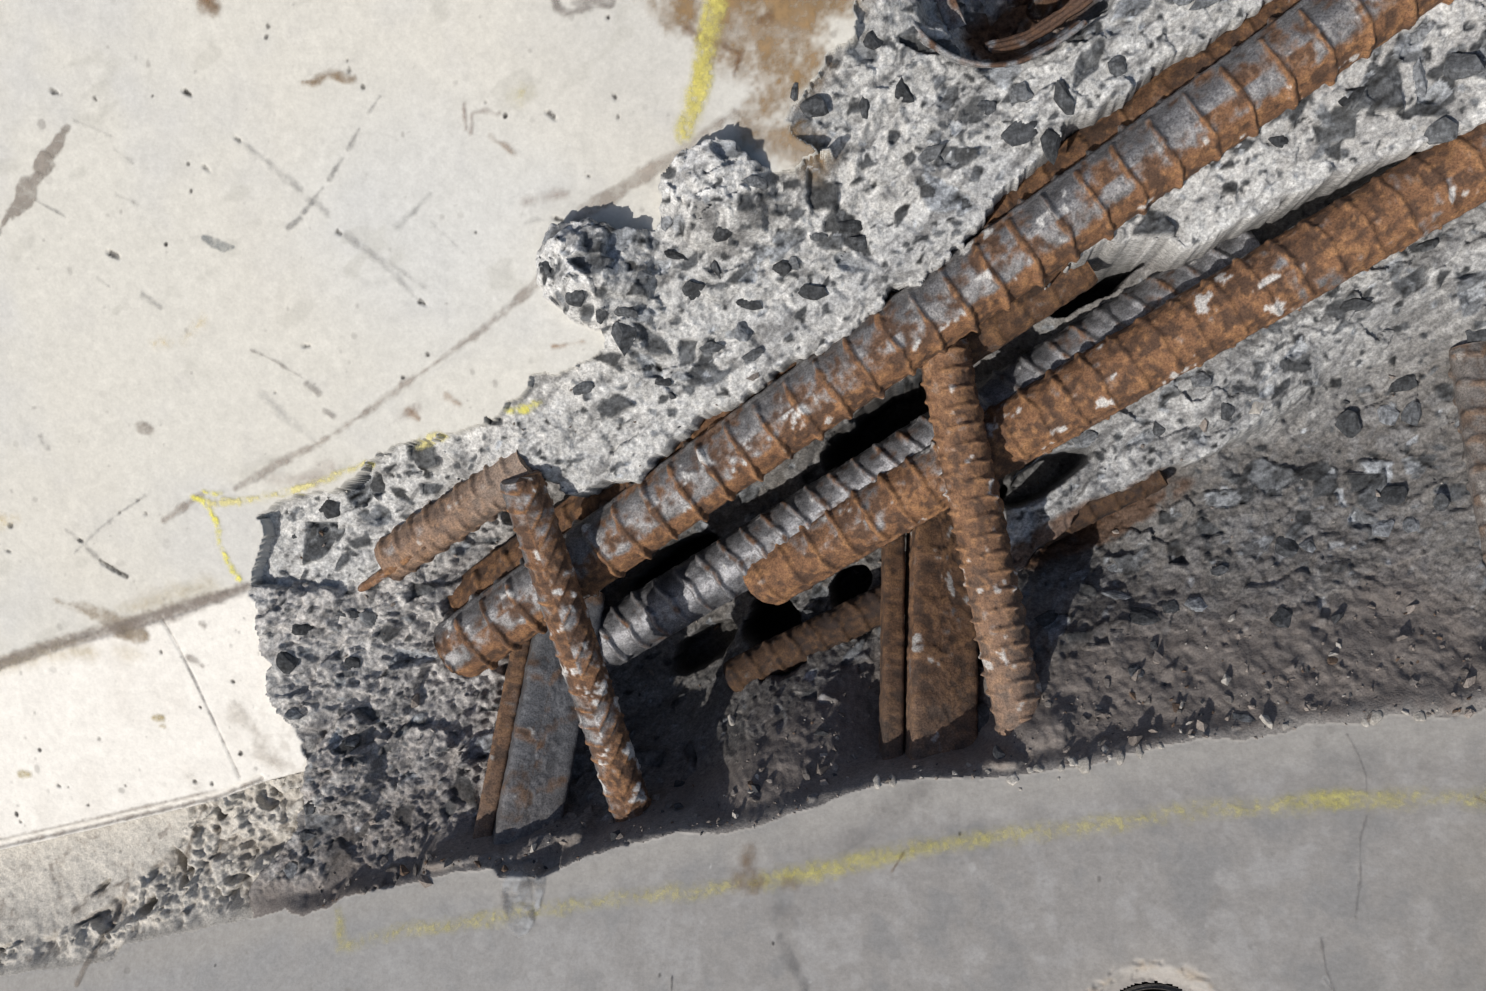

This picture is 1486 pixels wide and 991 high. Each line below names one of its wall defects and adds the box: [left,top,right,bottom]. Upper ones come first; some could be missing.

rust [671,0,850,168]
spalling [249,0,1486,918]